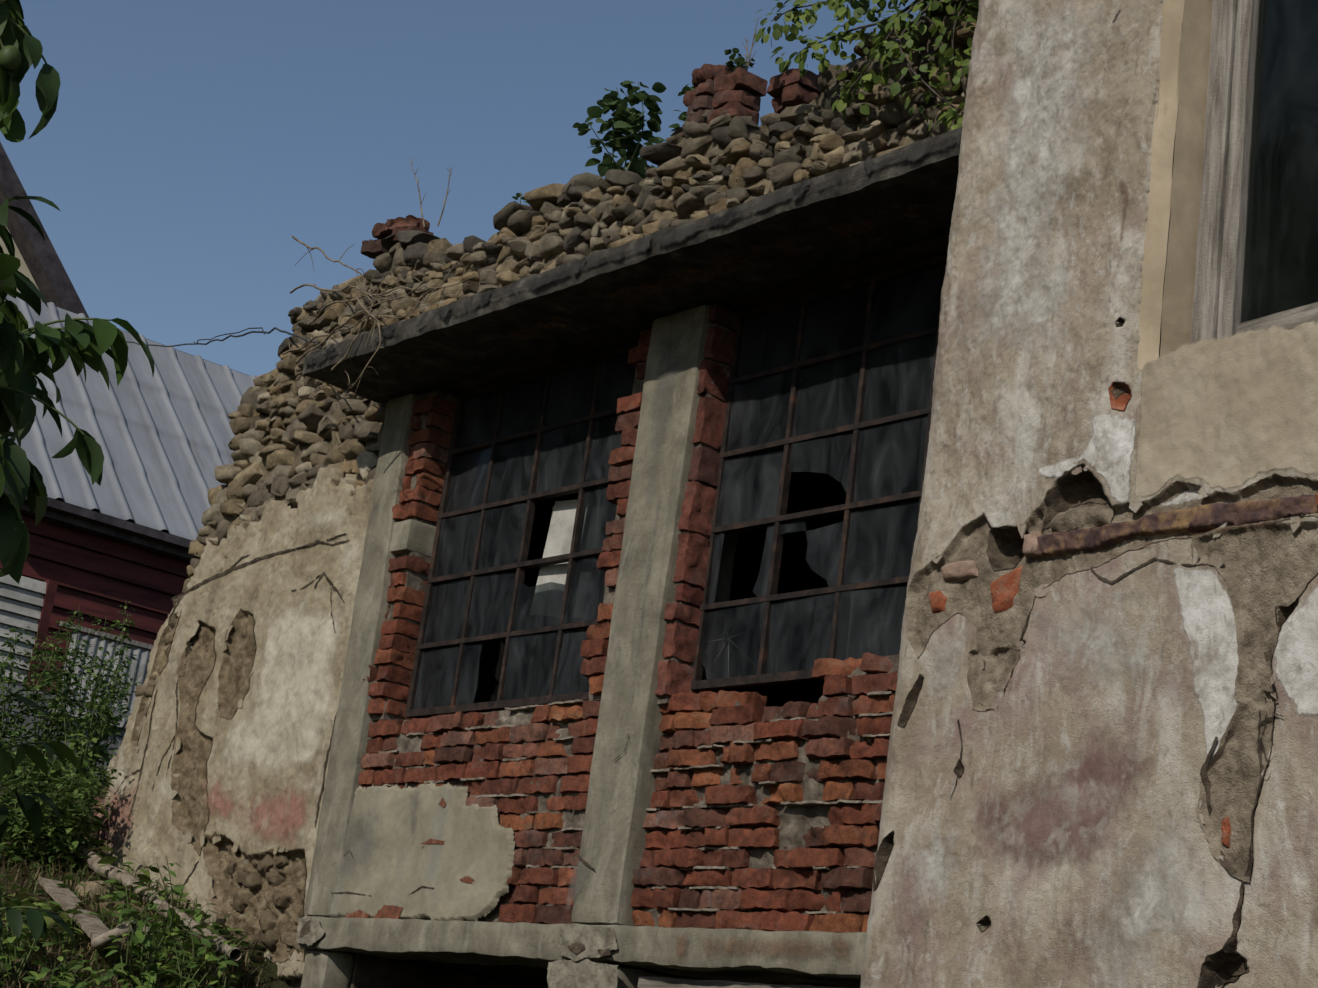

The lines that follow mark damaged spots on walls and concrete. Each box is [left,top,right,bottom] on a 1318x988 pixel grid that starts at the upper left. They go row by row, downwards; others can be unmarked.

peeling [118,608,338,974]
crack [114,533,349,846]
flaking render [345,903,405,919]
flaking render [420,839,446,848]
spalling [547,923,618,988]
flaking render [905,381,1318,888]
corrosion [1035,494,1318,559]
crack [1197,697,1284,988]